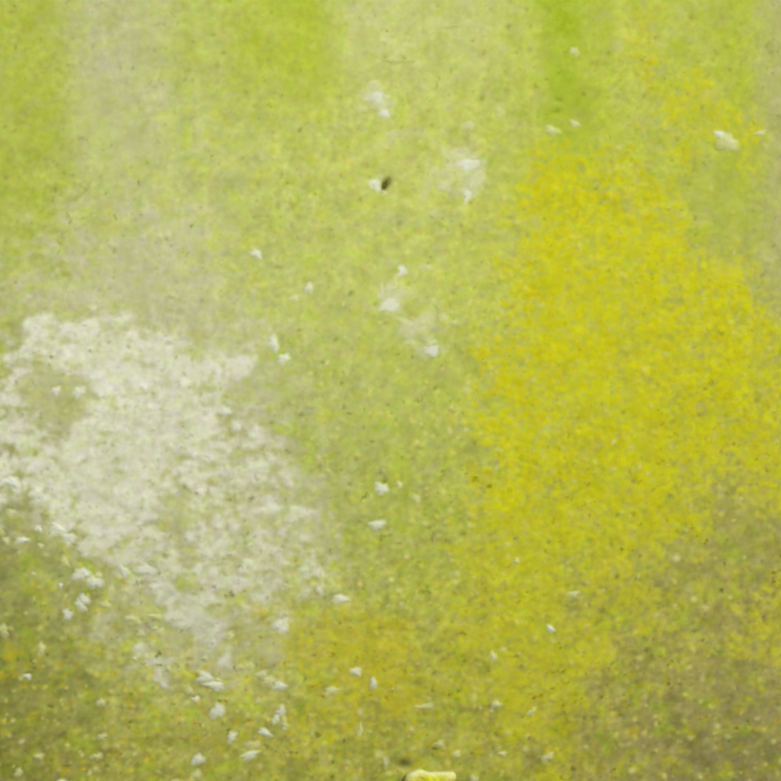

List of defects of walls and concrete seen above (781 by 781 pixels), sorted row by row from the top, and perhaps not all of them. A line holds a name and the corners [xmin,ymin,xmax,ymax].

leakage [0,0,376,721]
leakage [226,704,289,762]
leakage [170,752,207,781]